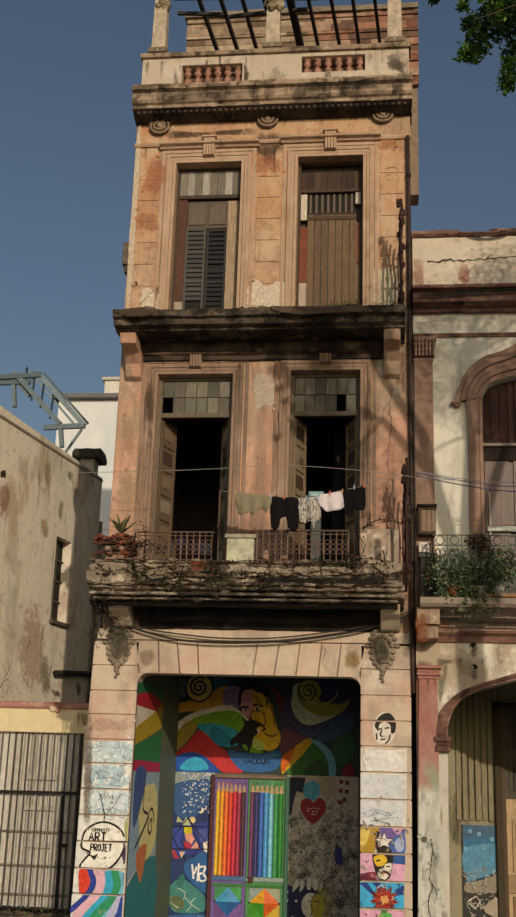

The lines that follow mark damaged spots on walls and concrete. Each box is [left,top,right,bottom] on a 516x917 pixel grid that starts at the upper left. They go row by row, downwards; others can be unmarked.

flaking render [121,125,166,317]
crack [427,254,516,263]
flaking render [246,266,404,315]
flaking render [253,373,277,413]
crack [383,388,395,491]
spalling [89,562,131,574]
spalling [145,568,205,584]
spalling [243,567,268,576]
water stain [42,659,60,696]
crack [417,839,437,917]